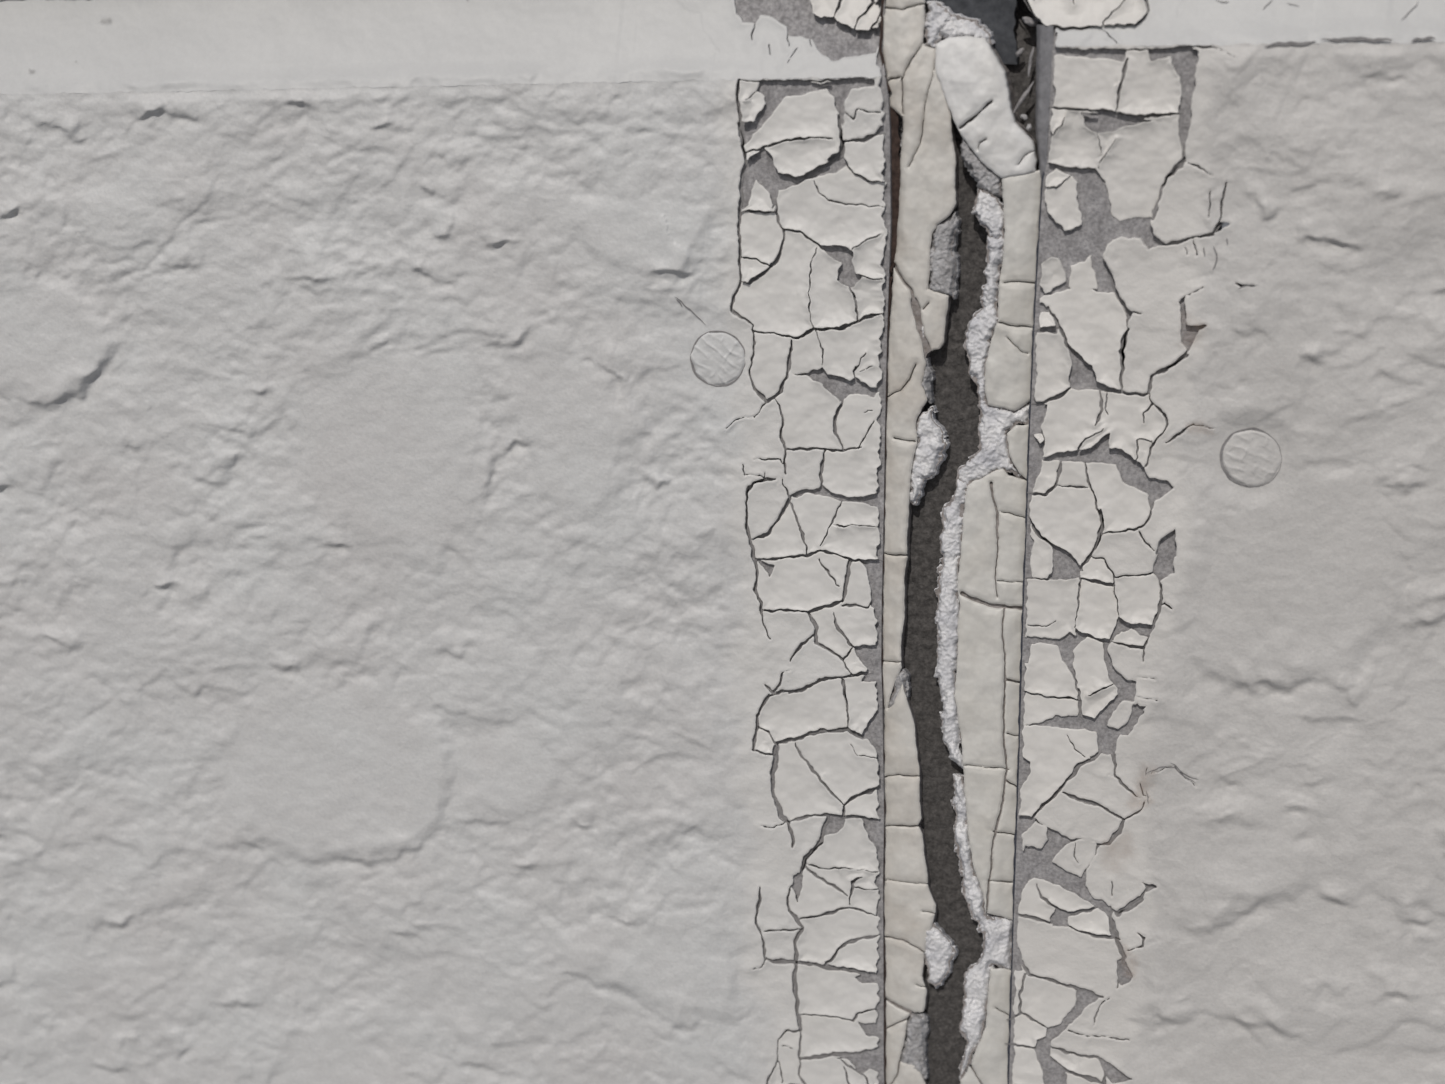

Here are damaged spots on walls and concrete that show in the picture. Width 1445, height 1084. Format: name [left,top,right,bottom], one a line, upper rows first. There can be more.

peeling [727,0,895,1084]
crack [879,0,1048,1084]
peeling [1005,0,1227,1084]